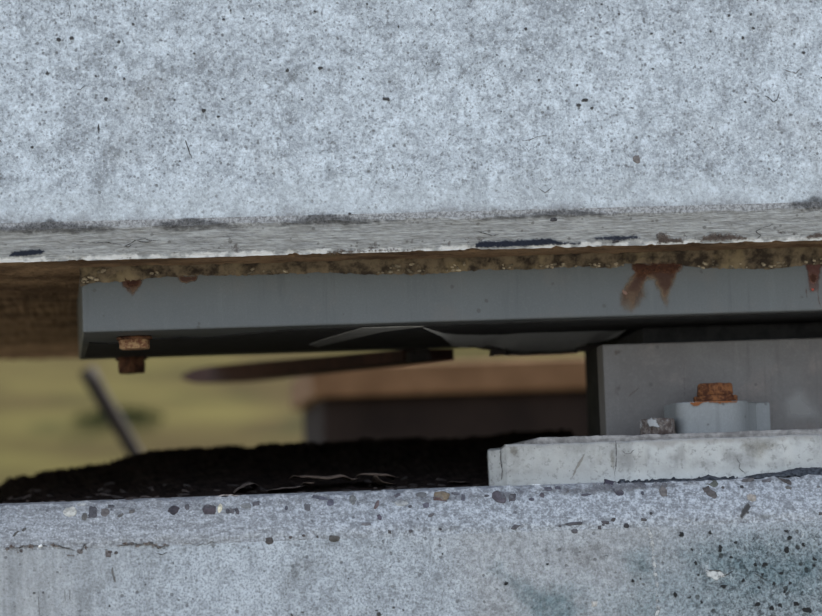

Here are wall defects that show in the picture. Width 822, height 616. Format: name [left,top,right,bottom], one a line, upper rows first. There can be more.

rust [622,263,681,308]
rust [805,264,822,304]